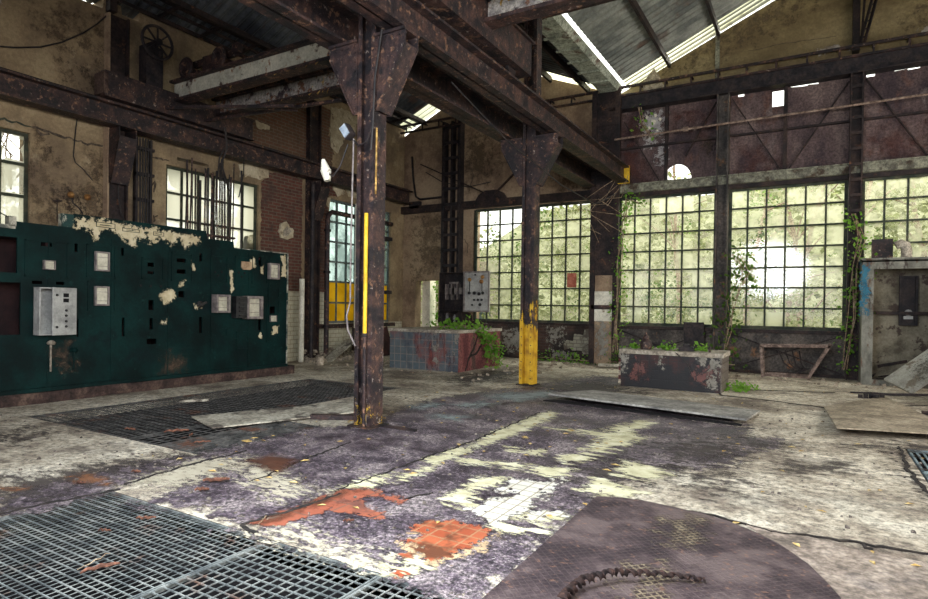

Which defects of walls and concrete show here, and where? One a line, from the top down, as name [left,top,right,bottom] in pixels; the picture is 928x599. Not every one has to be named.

spalling [246,91,323,159]
peeling [321,106,357,166]
peeling [73,217,201,249]
spalling [238,163,303,291]
spalling [320,185,357,292]
crack [690,510,928,555]